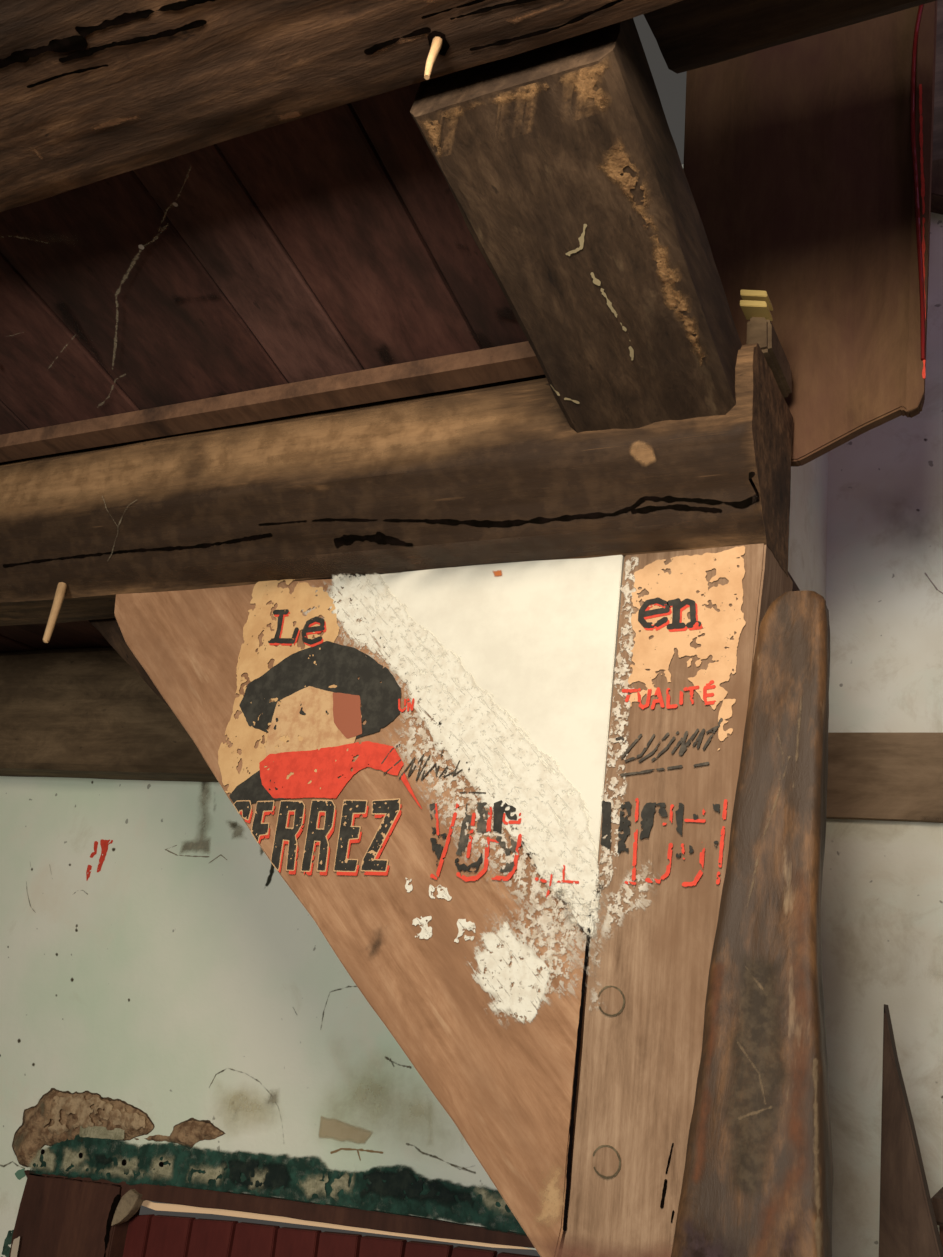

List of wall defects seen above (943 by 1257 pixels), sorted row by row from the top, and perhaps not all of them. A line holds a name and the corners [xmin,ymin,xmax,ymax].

crack [0,0,216,88]
crack [3,472,760,568]
peeling [0,423,763,1024]